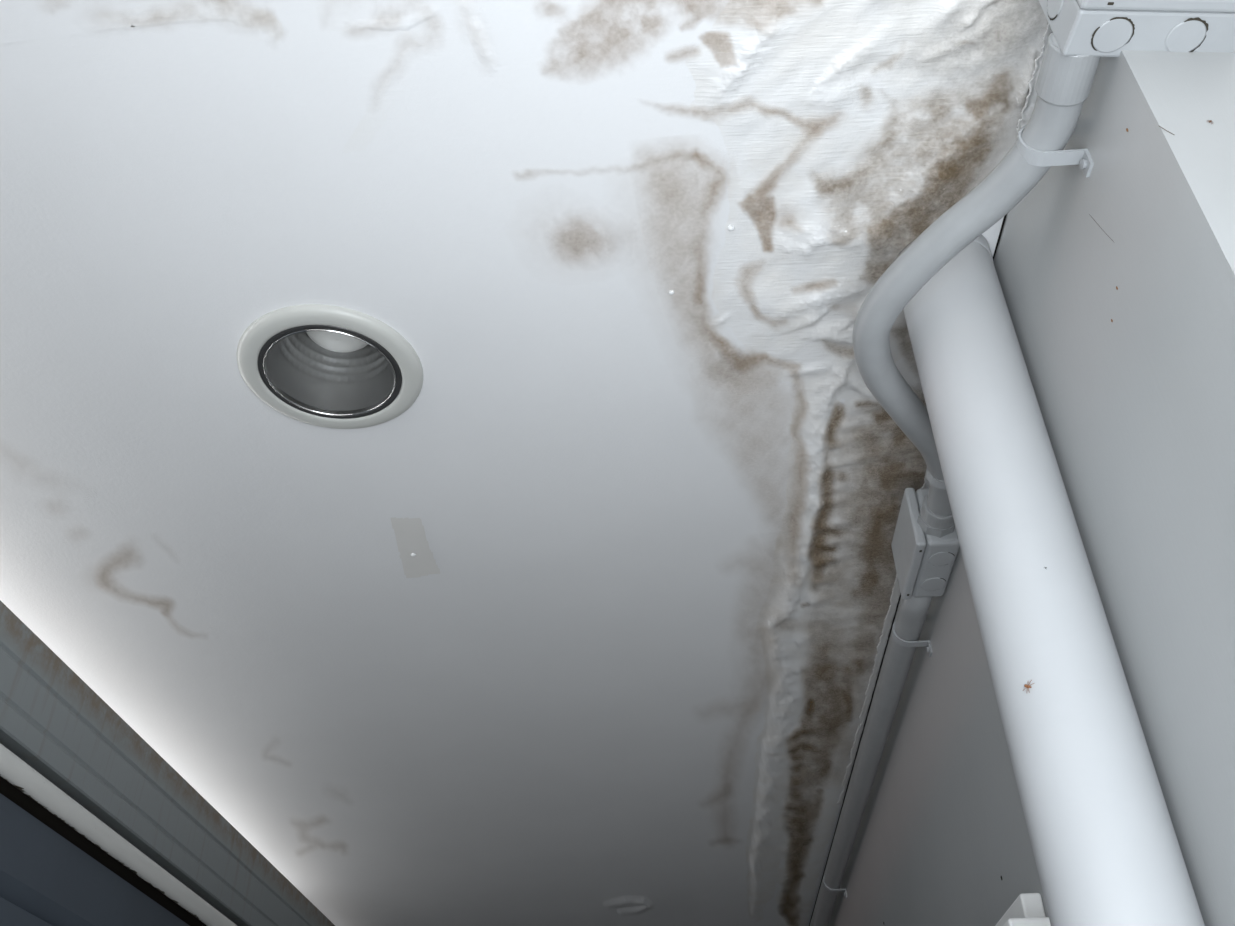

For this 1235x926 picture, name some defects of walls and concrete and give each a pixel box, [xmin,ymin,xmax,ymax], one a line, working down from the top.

damp [810,504,830,569]
damp [781,670,849,925]